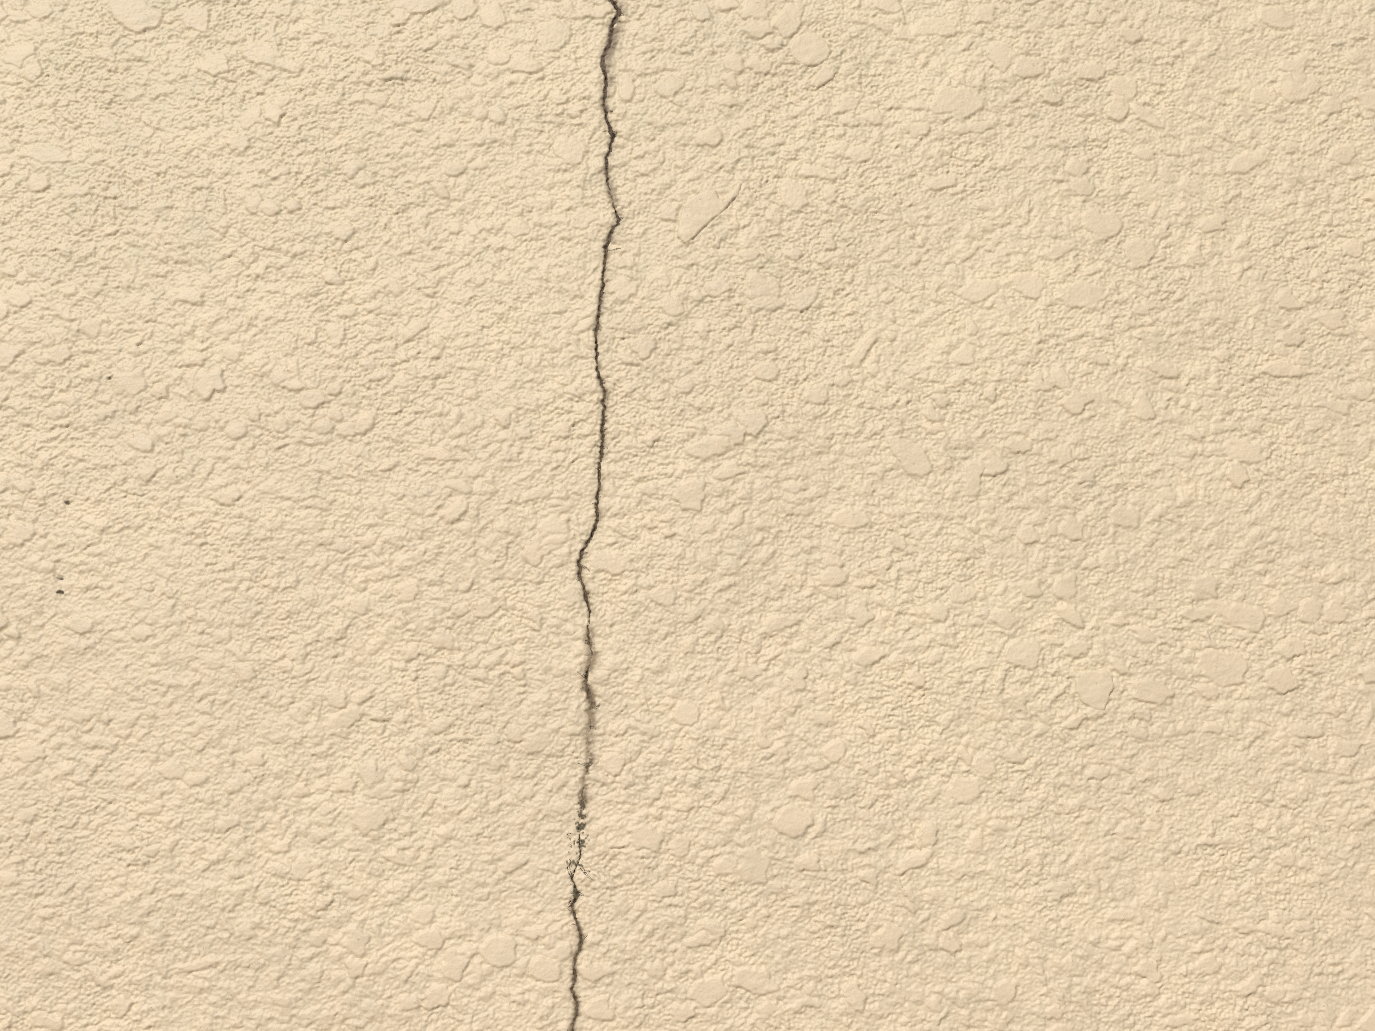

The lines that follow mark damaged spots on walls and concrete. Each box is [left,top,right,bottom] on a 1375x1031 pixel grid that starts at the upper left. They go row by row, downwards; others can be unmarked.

crack [566,0,625,1031]